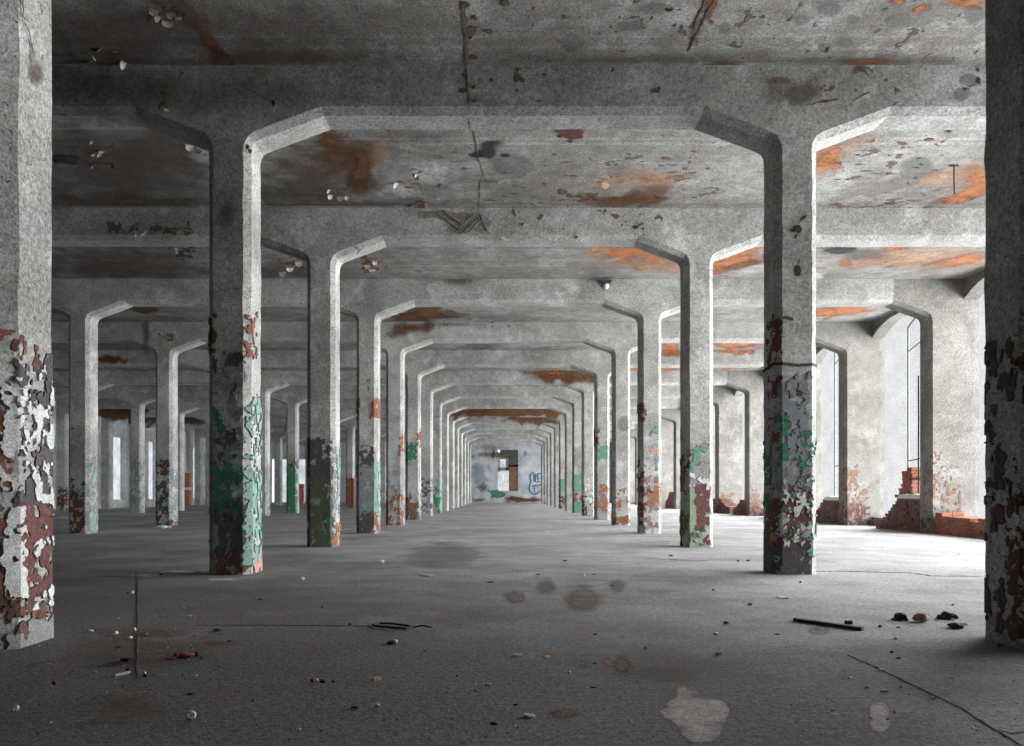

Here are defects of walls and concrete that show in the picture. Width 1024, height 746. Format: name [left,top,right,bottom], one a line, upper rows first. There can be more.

crack [500,0,510,8]
crack [459,1,493,205]
corrosion [588,175,669,207]
corrosion [816,146,844,173]
corrosion [927,168,986,204]
corrosion [533,371,594,385]
peeling [0,328,98,650]
peeling [208,311,270,575]
peeling [286,428,442,547]
peeling [669,314,817,583]
peeling [984,334,1024,641]
crack [847,654,1024,746]